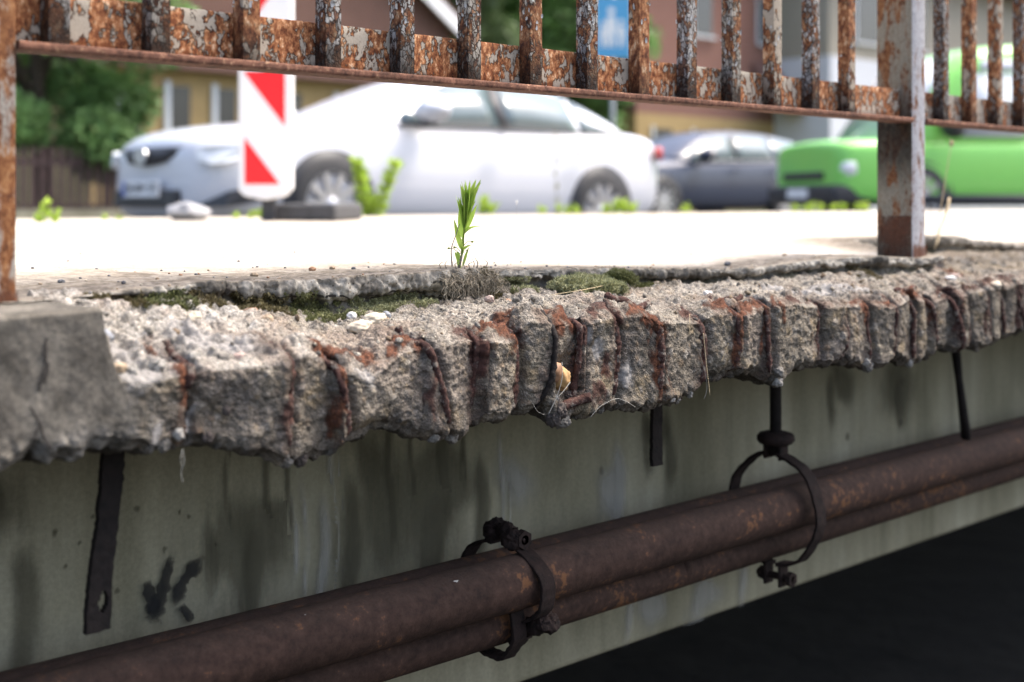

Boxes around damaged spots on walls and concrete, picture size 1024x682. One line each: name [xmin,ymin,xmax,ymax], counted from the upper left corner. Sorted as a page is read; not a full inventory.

corrosion [879,216,927,257]
corrosion [0,290,18,305]
corrosion [310,334,422,443]
corrosion [452,307,522,397]
spalling [30,249,1024,469]
corrosion [544,299,671,403]
corrosion [704,295,820,366]
corrosion [900,286,933,322]
corrosion [934,267,1024,344]
water stain [211,461,306,611]
water stain [15,566,36,668]